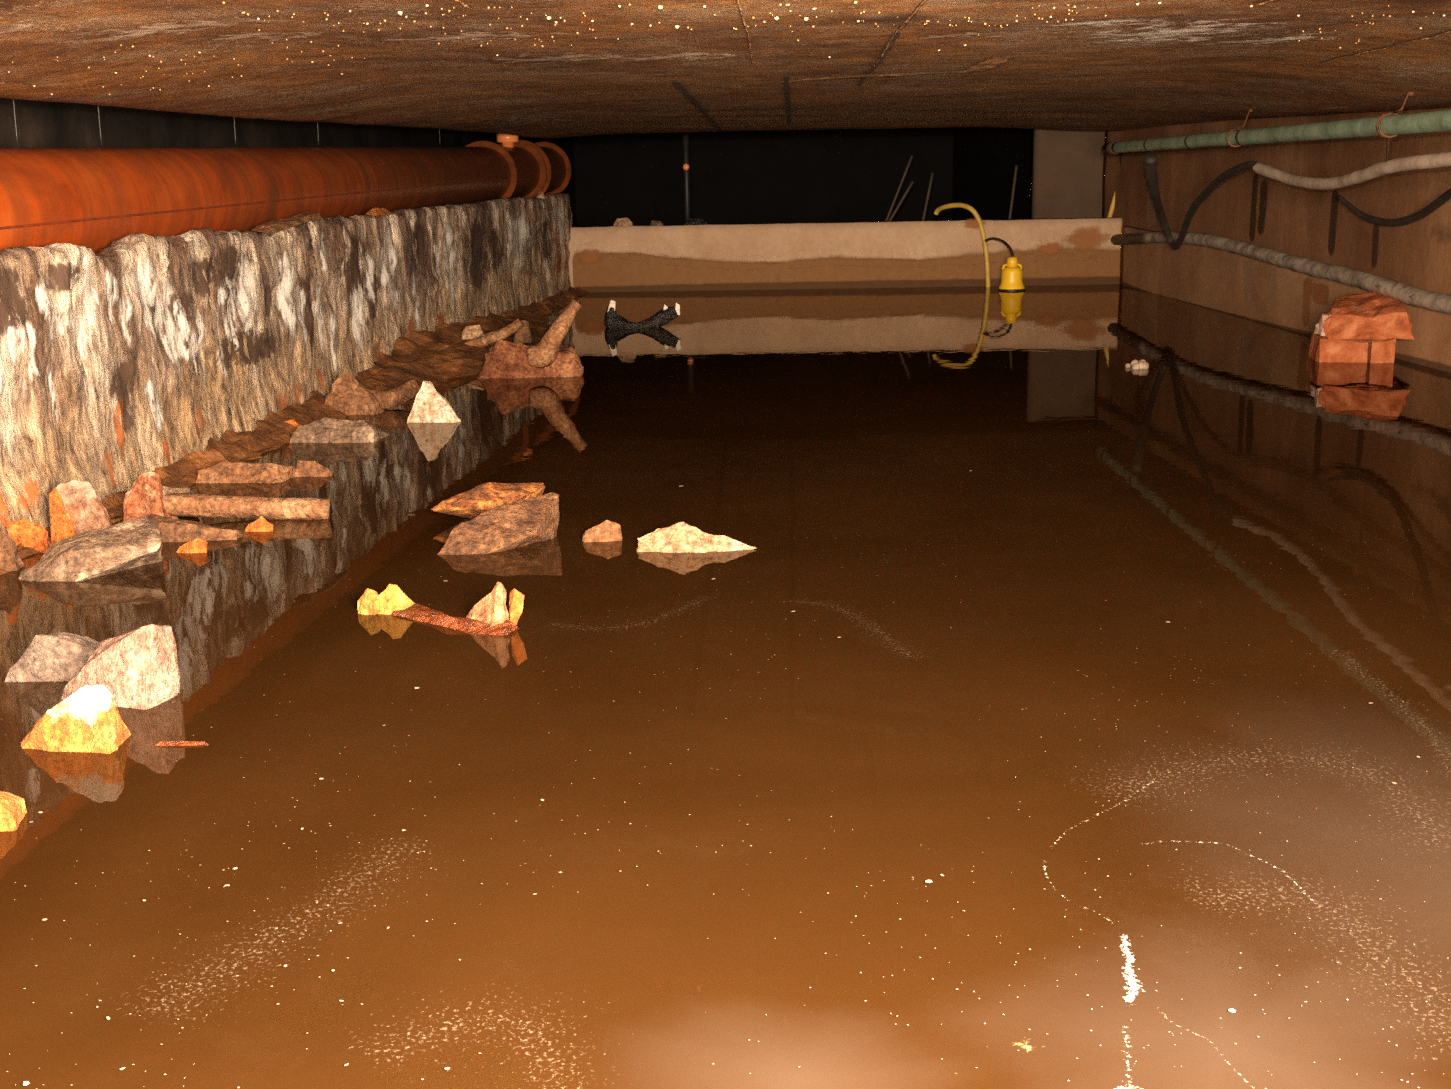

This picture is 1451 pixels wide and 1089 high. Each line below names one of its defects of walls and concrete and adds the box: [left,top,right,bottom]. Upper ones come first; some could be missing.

crack [736,0,1017,126]
corrosion [366,207,395,216]
water stain [1250,174,1267,241]
water stain [572,248,1150,293]
water stain [1395,353,1451,373]